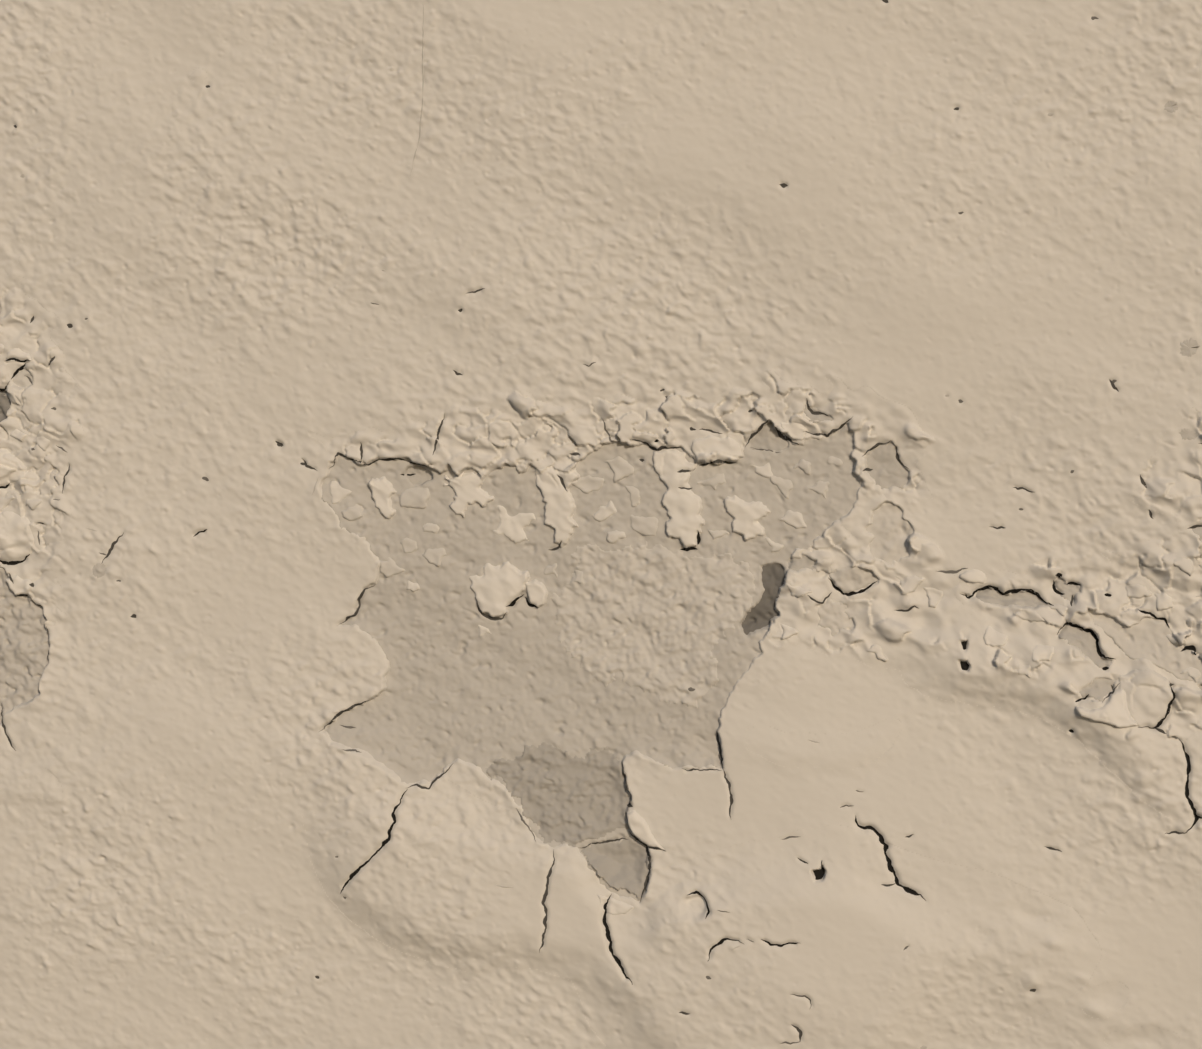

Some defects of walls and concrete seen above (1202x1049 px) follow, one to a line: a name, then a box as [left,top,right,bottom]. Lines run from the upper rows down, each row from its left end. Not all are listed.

spalling [0,256,86,724]
crack [1140,475,1153,519]
spalling [308,370,1202,915]
crack [1139,610,1196,655]
crack [1140,683,1202,834]
crack [340,766,451,894]
crack [517,763,665,953]
crack [840,790,924,899]
crack [602,895,633,985]
crack [688,891,798,961]